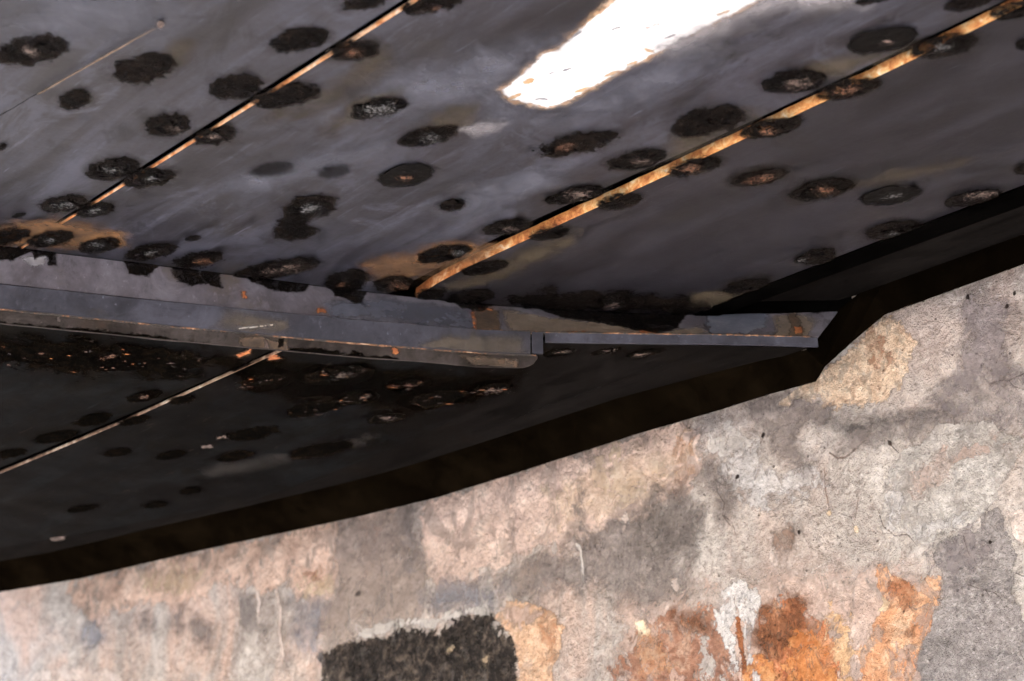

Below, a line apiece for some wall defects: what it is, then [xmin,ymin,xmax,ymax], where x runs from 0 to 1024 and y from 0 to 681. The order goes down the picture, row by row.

corrosion [0,221,125,248]
corrosion [363,243,495,291]
corrosion [458,240,571,286]
corrosion [225,316,288,360]
corrosion [419,308,520,367]
corrosion [606,564,942,681]